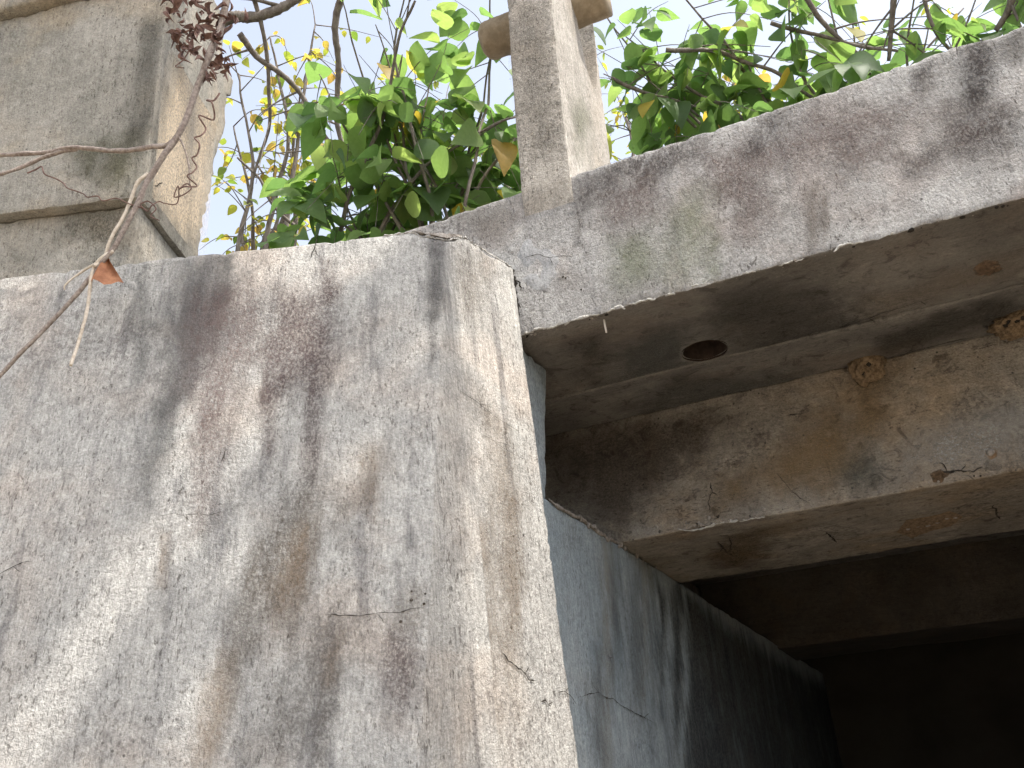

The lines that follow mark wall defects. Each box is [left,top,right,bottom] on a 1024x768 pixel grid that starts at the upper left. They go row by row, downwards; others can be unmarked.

leakage [944,39,1012,153]
leakage [579,144,685,219]
leakage [709,112,897,225]
leakage [178,276,252,430]
leakage [262,271,333,462]
crack [931,463,982,476]
leakage [252,491,315,604]
crack [328,607,425,623]
leakage [385,638,413,703]
crack [503,653,651,721]